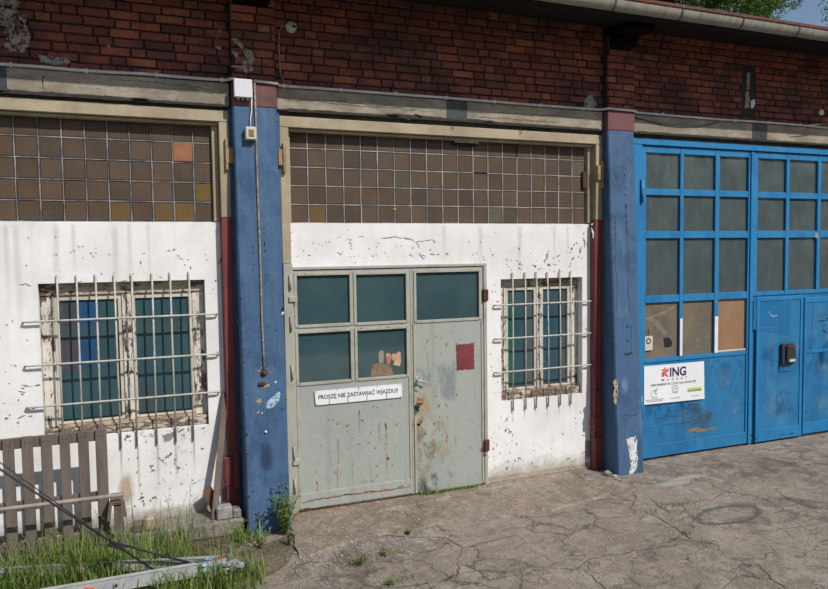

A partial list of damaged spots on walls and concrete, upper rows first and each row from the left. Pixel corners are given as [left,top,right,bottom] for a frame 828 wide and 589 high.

peeling [0,0,31,53]
peeling [231,38,255,73]
peeling [627,436,638,474]
corrosion [300,464,411,512]